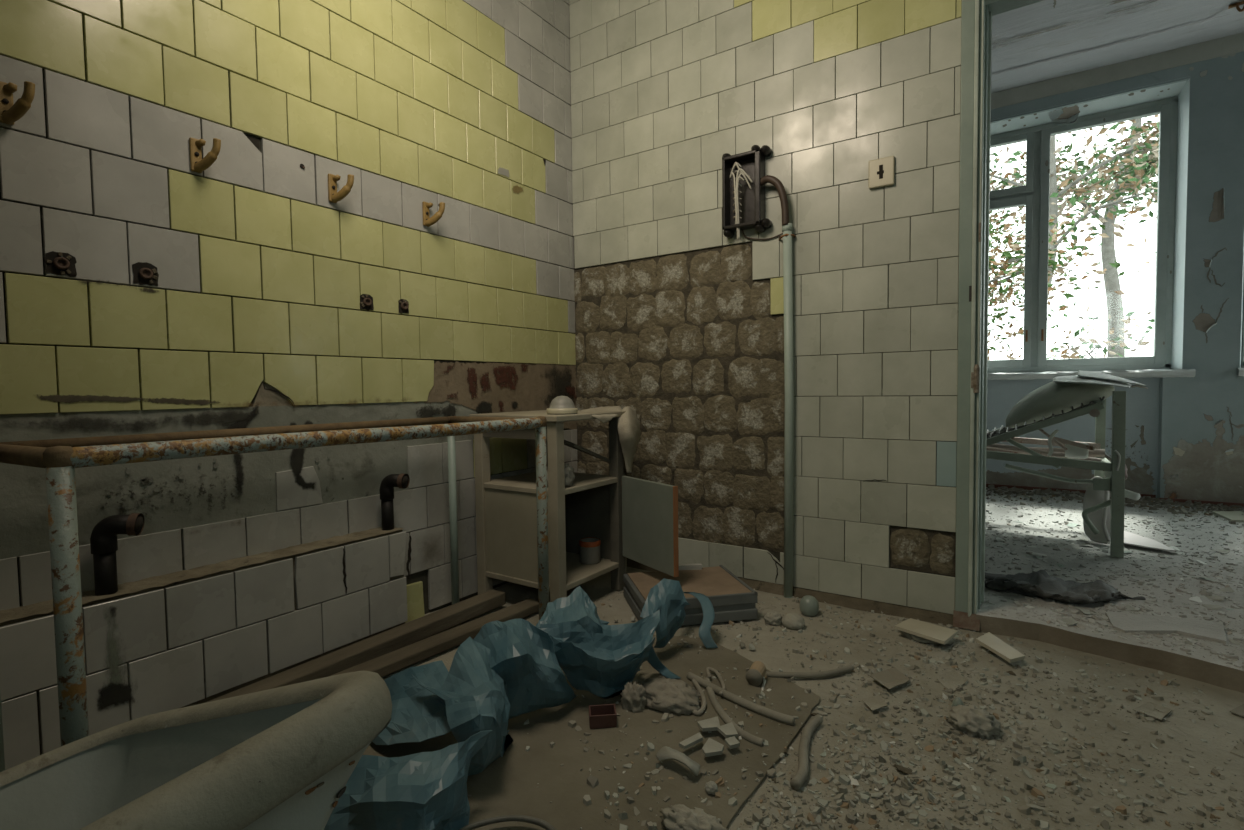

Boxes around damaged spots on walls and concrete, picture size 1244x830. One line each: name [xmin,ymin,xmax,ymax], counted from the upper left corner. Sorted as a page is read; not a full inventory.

crack [1201,247,1229,343]
peeling [0,242,785,559]
peeling [986,414,1244,503]
peeling [889,526,956,576]